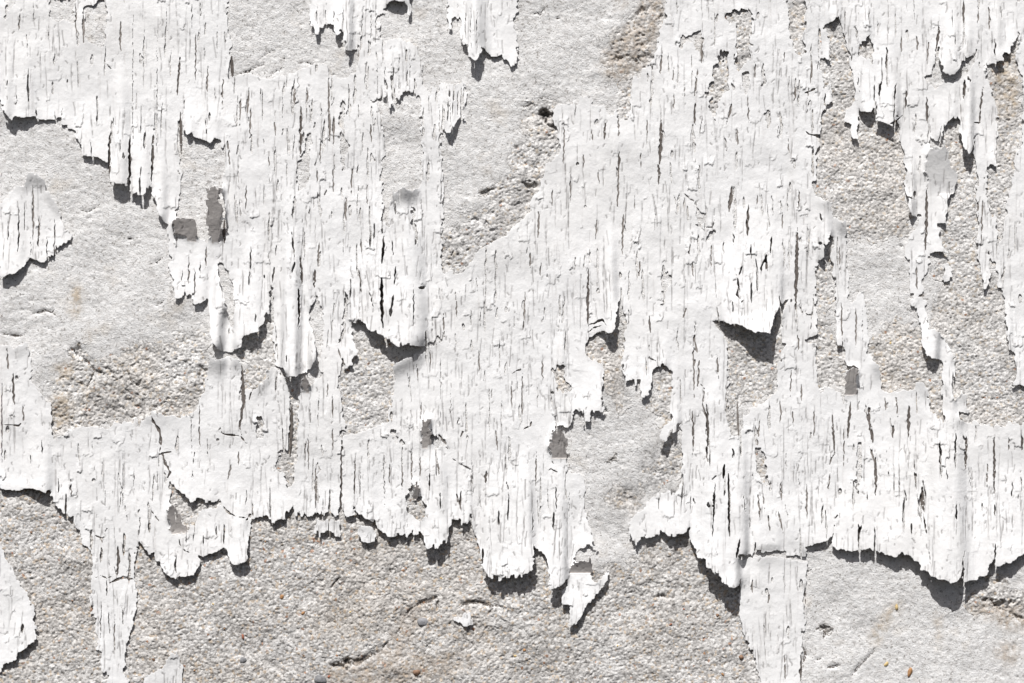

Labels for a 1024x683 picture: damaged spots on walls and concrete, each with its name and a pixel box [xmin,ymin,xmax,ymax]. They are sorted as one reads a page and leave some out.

peeling [446,0,519,67]
spalling [813,20,916,249]
peeling [0,172,72,277]
peeling [361,284,426,347]
spalling [930,118,1024,427]
spalling [43,324,211,439]
spalling [338,333,403,436]
spalling [0,488,109,683]
spalling [123,499,759,683]
peeling [696,517,808,683]
peeling [827,522,891,556]
peeling [915,522,992,584]